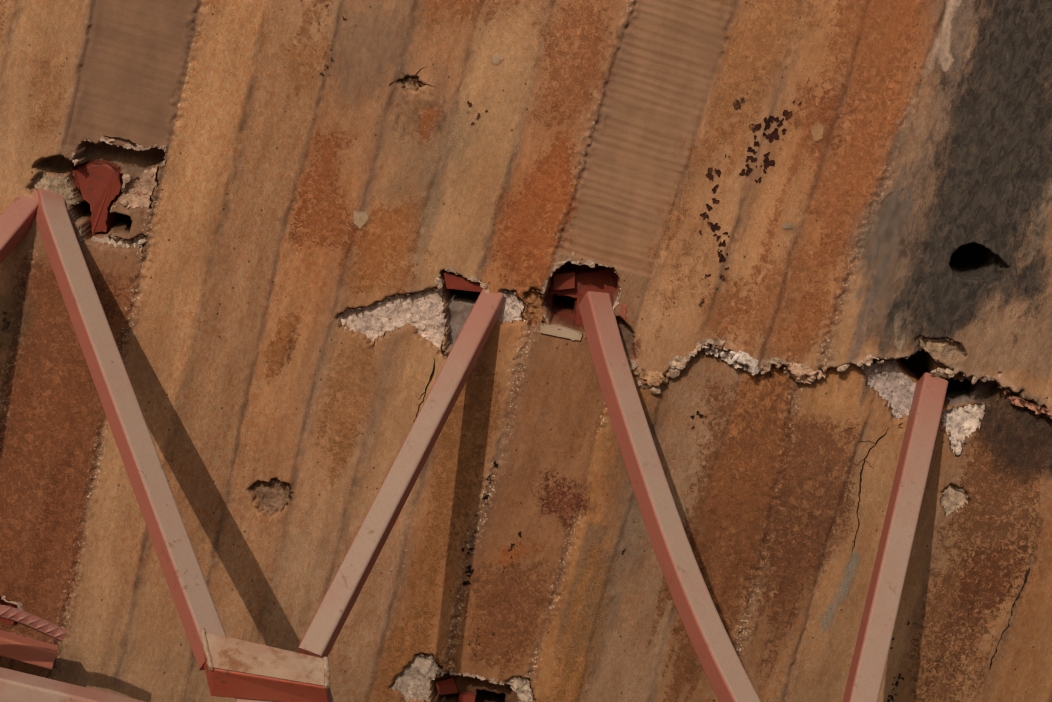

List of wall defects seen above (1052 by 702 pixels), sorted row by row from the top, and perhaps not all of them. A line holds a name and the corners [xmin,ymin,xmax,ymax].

spalling [28,171,81,205]
spalling [70,136,167,210]
rust [485,0,615,302]
spalling [78,226,147,251]
spalling [338,251,621,356]
spalling [629,311,1052,456]
spalling [251,480,291,515]
crack [842,427,889,568]
spalling [390,654,535,702]